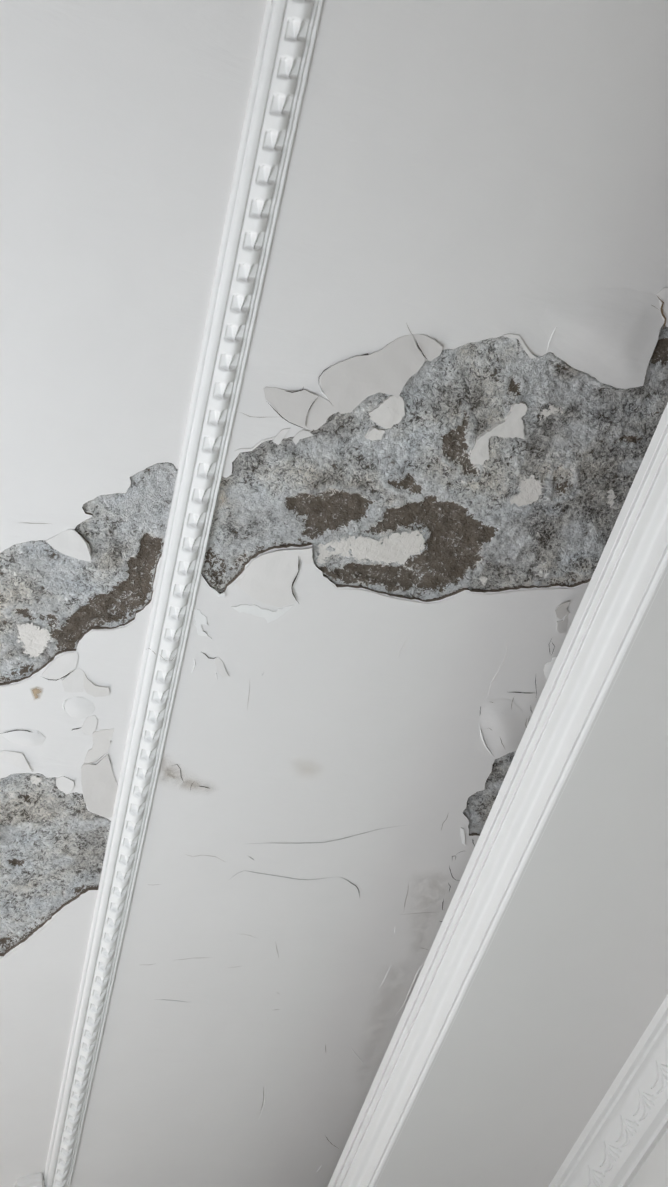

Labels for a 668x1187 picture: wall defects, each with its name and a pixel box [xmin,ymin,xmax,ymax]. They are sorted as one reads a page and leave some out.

flaking render [201,288,668,633]
flaking render [0,462,178,697]
flaking render [0,729,118,959]
flaking render [460,752,516,846]